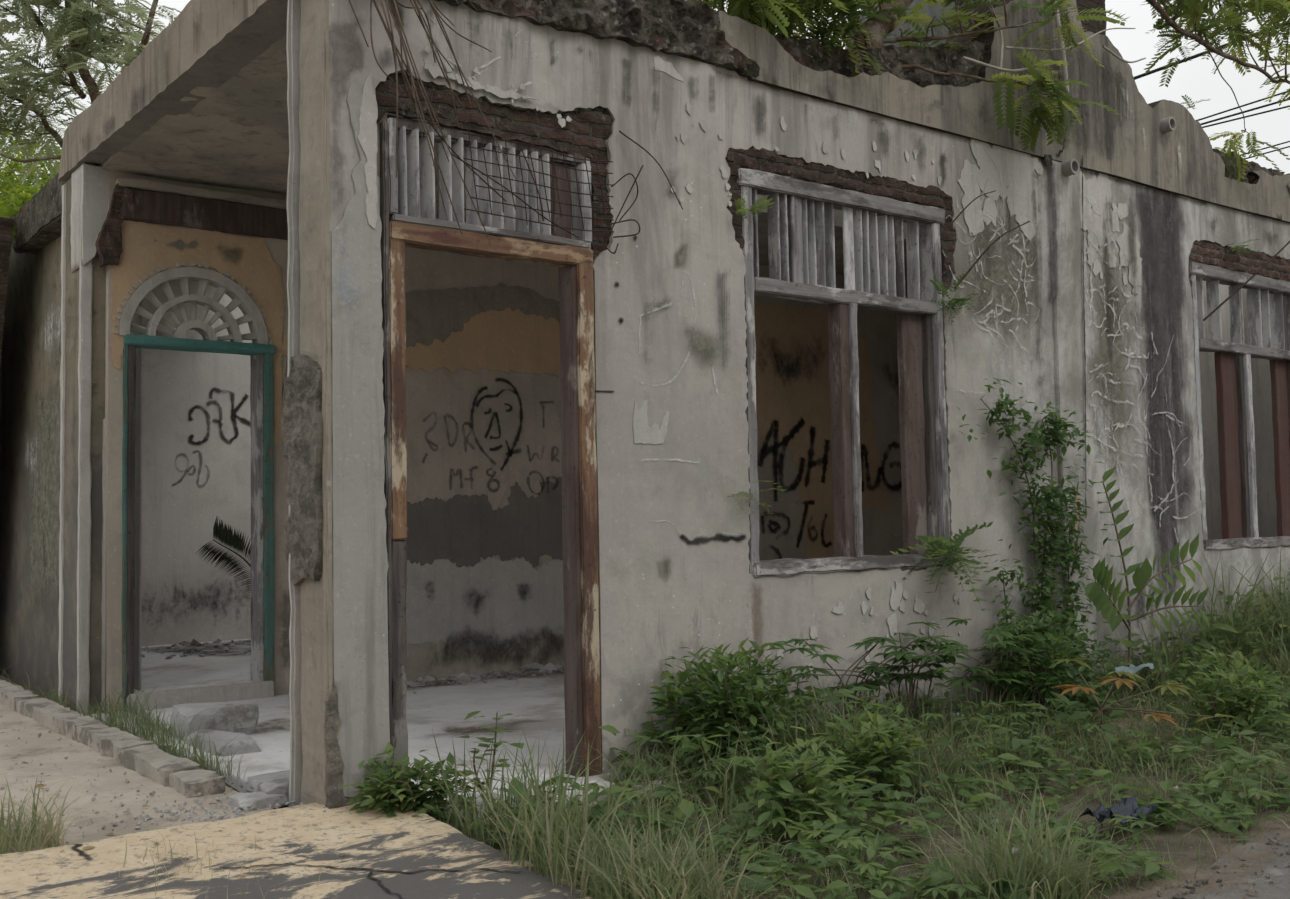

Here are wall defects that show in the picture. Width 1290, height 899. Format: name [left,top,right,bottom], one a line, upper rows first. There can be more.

spalling [435,0,760,82]
damp [1016,0,1131,156]
spalling [675,102,1053,298]
damp [1104,238,1120,353]
flaking render [95,23,613,809]
damp [1129,188,1191,622]
damp [443,628,564,665]
peeling [861,580,961,640]